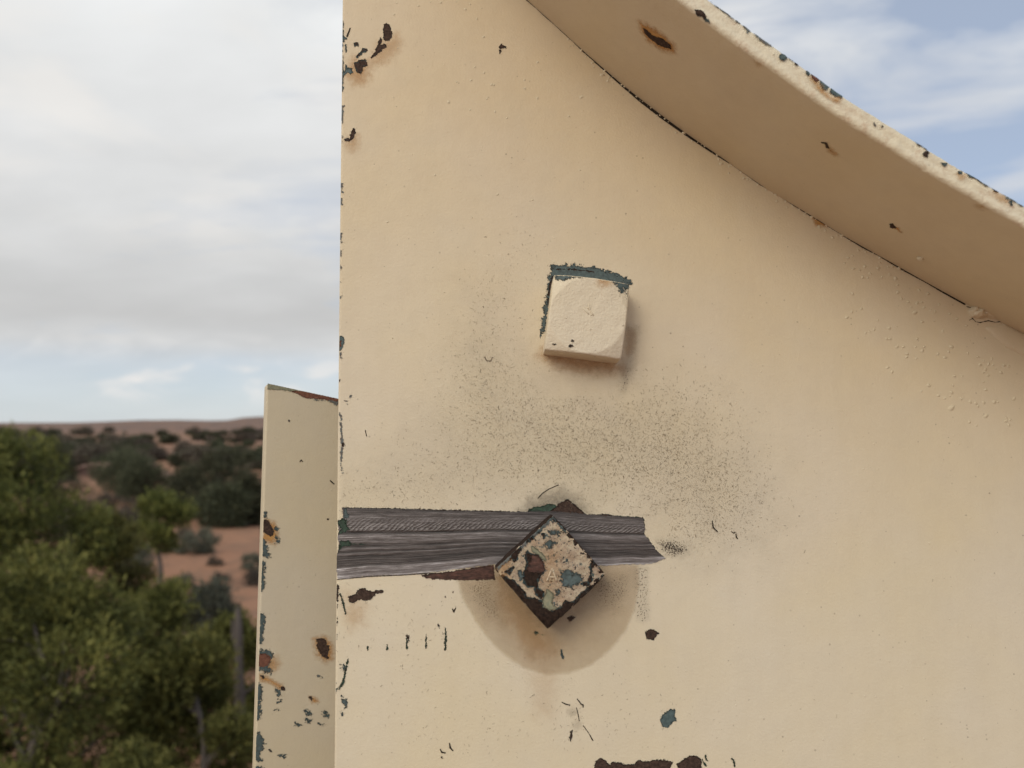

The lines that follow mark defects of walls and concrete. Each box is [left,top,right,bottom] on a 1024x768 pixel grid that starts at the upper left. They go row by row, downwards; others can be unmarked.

peeling [342,23,392,92]
rust [640,24,674,52]
peeling [695,1,842,101]
peeling [539,263,632,336]
rust [262,511,281,558]
peeling [336,584,384,622]
rust [421,533,603,628]
rust [316,638,332,659]
peeling [645,629,659,640]
rust [259,648,285,697]
peeling [294,688,348,727]
peeling [660,709,677,728]